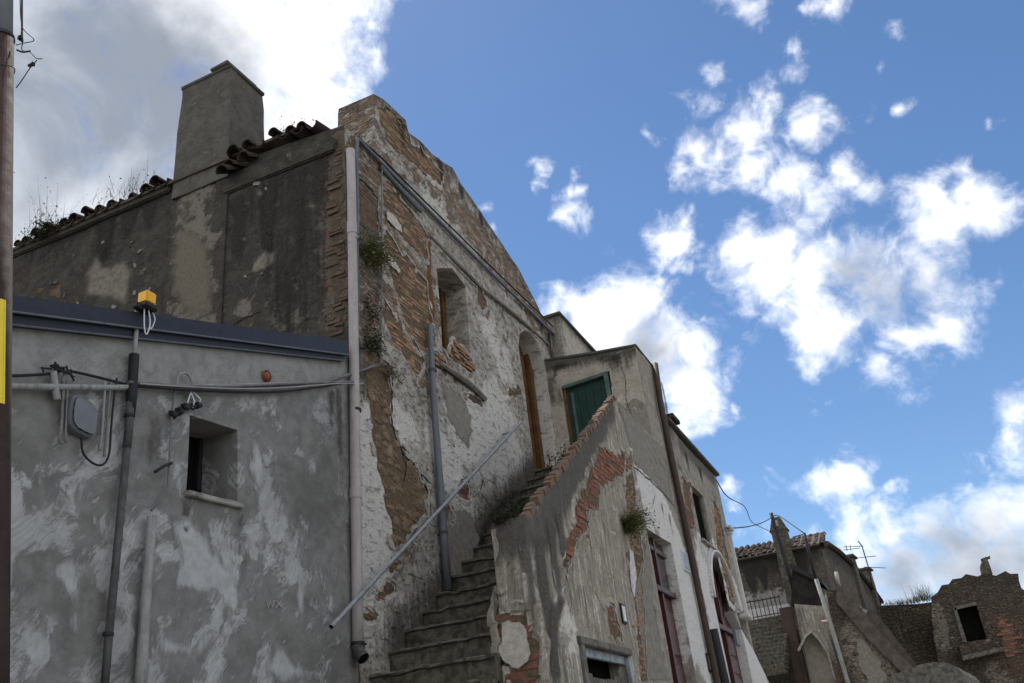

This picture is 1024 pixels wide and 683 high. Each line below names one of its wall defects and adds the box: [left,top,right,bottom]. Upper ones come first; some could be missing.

flaking render [375,102,445,191]
flaking render [359,175,489,633]
flaking render [487,586,551,683]
flaking render [559,403,696,683]